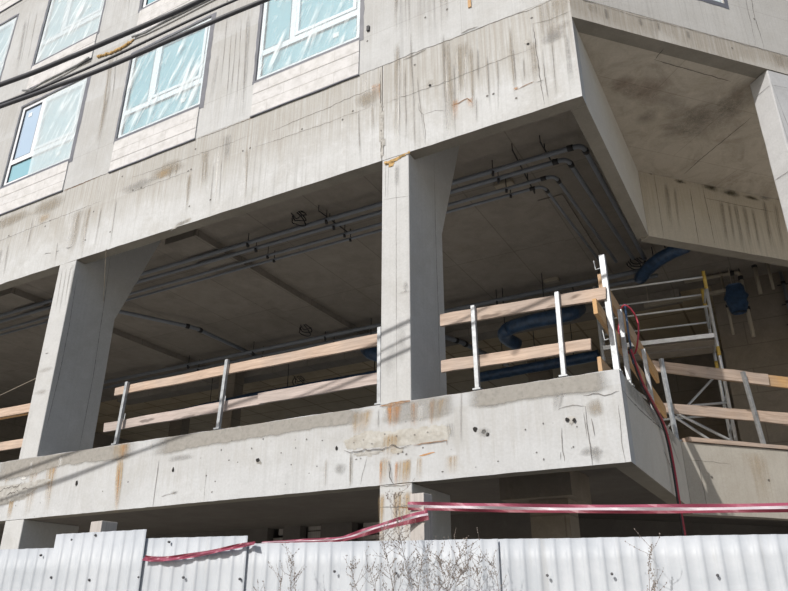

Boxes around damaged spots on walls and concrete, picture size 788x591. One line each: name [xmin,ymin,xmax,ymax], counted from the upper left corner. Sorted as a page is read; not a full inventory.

crack [133,5,567,192]
spalling [335,424,451,460]
rust [381,400,415,419]
crack [559,391,662,458]
spalling [0,478,52,505]